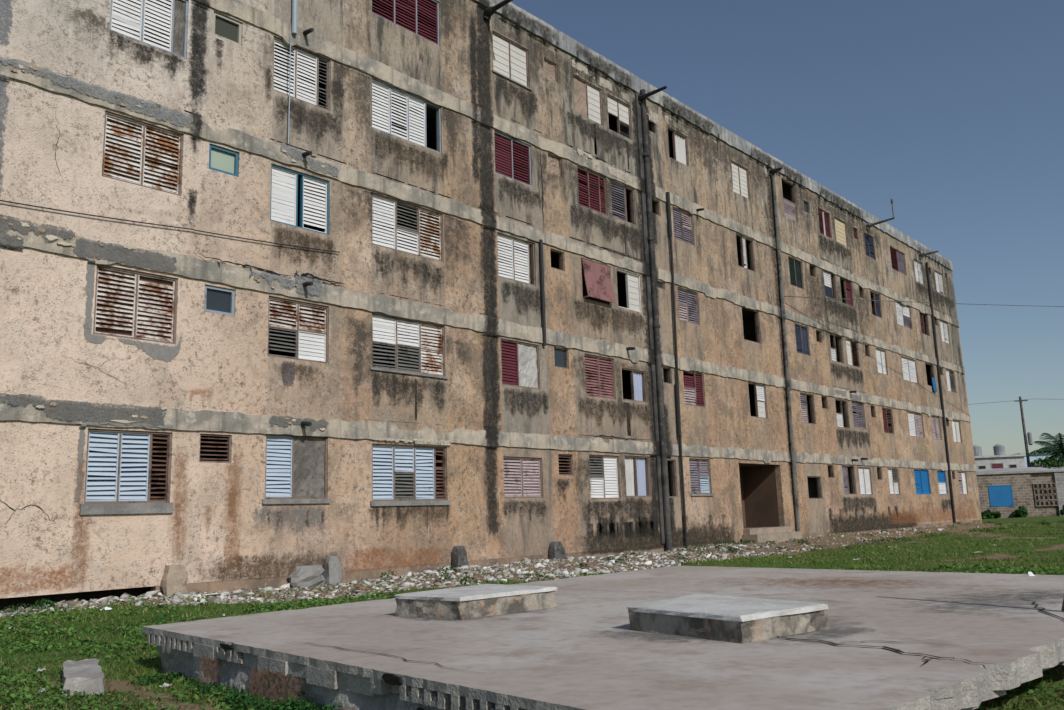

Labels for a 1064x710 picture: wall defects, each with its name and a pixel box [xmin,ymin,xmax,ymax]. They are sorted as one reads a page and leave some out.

spalling [0,0,193,183]
water stain [76,0,222,152]
water stain [266,63,370,140]
water stain [188,190,197,215]
spalling [0,215,177,272]
water stain [374,218,467,289]
water stain [440,0,735,554]
water stain [663,104,878,507]
spalling [0,391,167,426]
water stain [282,362,313,387]
water stain [350,321,445,410]
water stain [372,505,449,528]